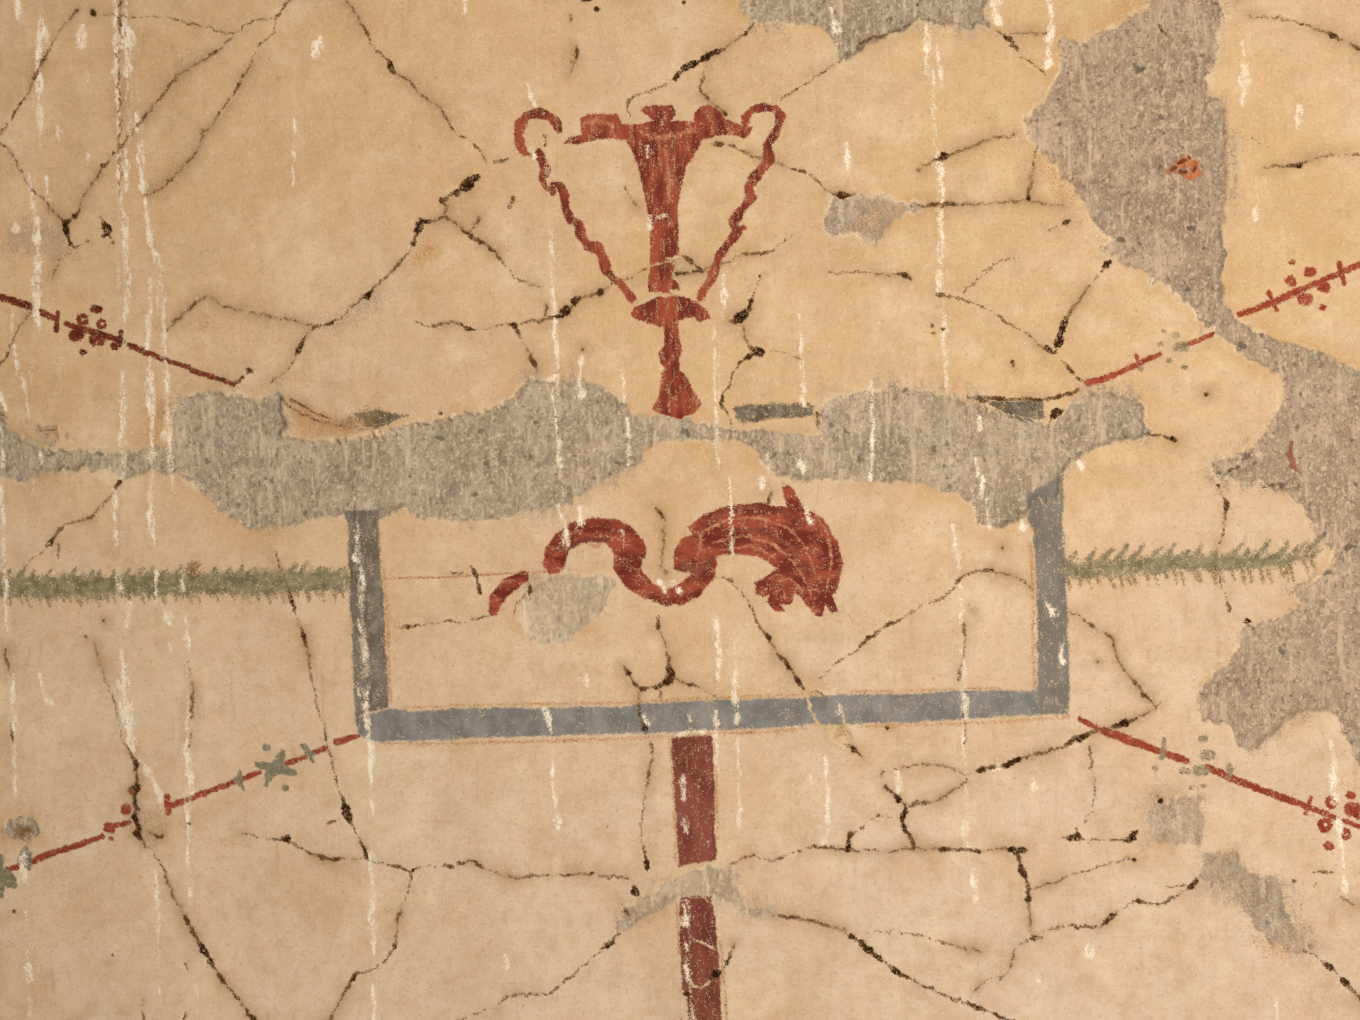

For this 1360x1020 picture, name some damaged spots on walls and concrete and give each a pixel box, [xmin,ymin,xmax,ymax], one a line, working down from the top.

damp [0,386,19,798]
damp [0,0,82,418]
damp [75,24,88,50]
damp [110,0,200,1020]
crack [241,549,716,1020]
crack [166,0,803,429]
spalling [506,557,616,664]
spalling [0,359,1155,542]
spalling [737,0,993,63]
crack [713,547,1199,1020]
crack [828,257,1112,428]
spalling [1009,0,1360,769]